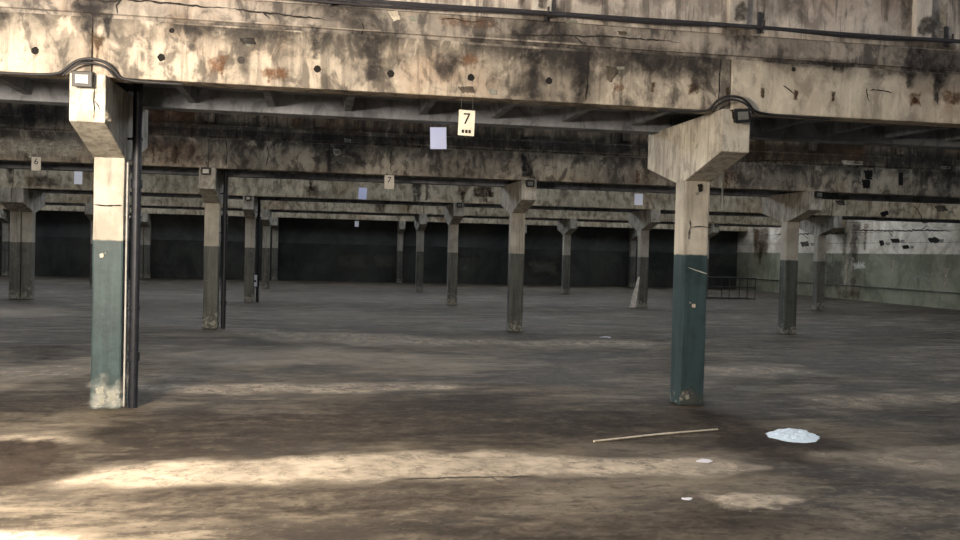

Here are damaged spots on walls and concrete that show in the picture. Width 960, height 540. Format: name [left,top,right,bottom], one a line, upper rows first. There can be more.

water stain [78,4,111,37]
water stain [363,35,384,80]